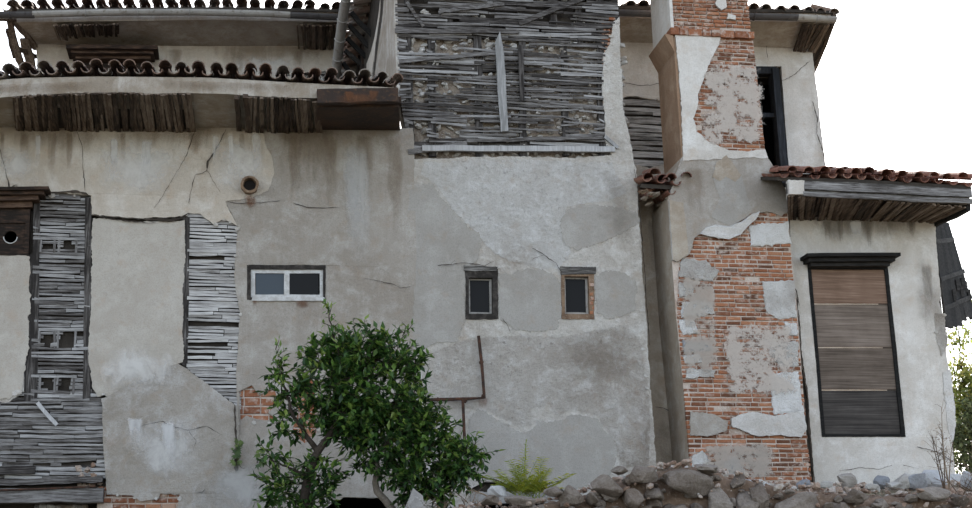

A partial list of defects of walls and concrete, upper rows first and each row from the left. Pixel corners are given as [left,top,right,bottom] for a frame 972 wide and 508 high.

crack [51,130,334,223]
flaking render [395,0,664,270]
flaking render [0,193,182,508]
flaking render [186,212,276,425]